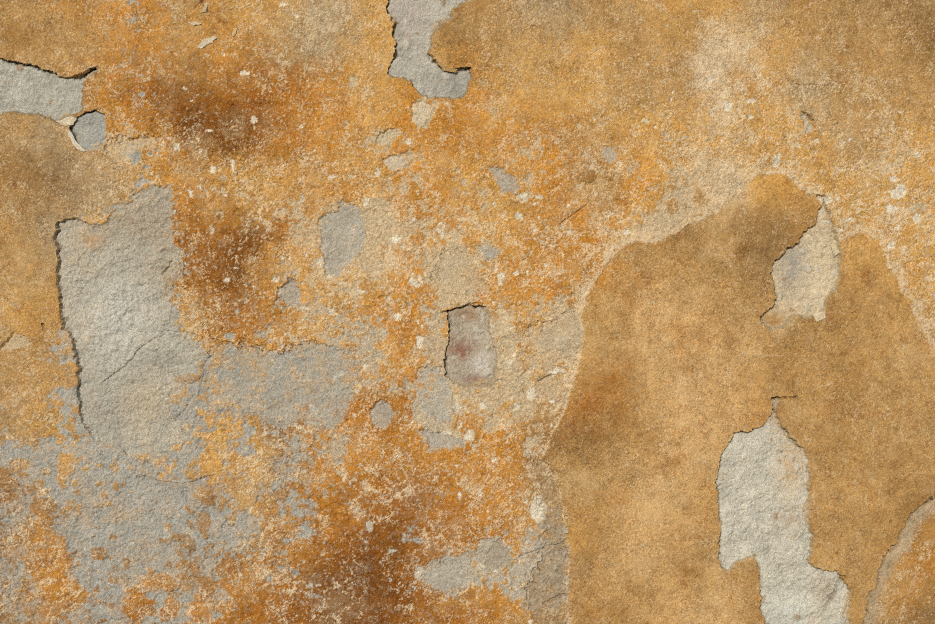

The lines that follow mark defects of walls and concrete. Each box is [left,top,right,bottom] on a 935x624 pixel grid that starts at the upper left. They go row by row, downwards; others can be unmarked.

spalling [0,58,164,166]
peeling [375,127,409,172]
spalling [386,0,473,135]
peeling [0,331,32,354]
peeling [52,182,367,459]
spalling [410,304,498,455]
peeling [477,240,502,262]
spalling [760,199,843,333]
spalling [715,397,851,624]
spalling [863,496,935,624]